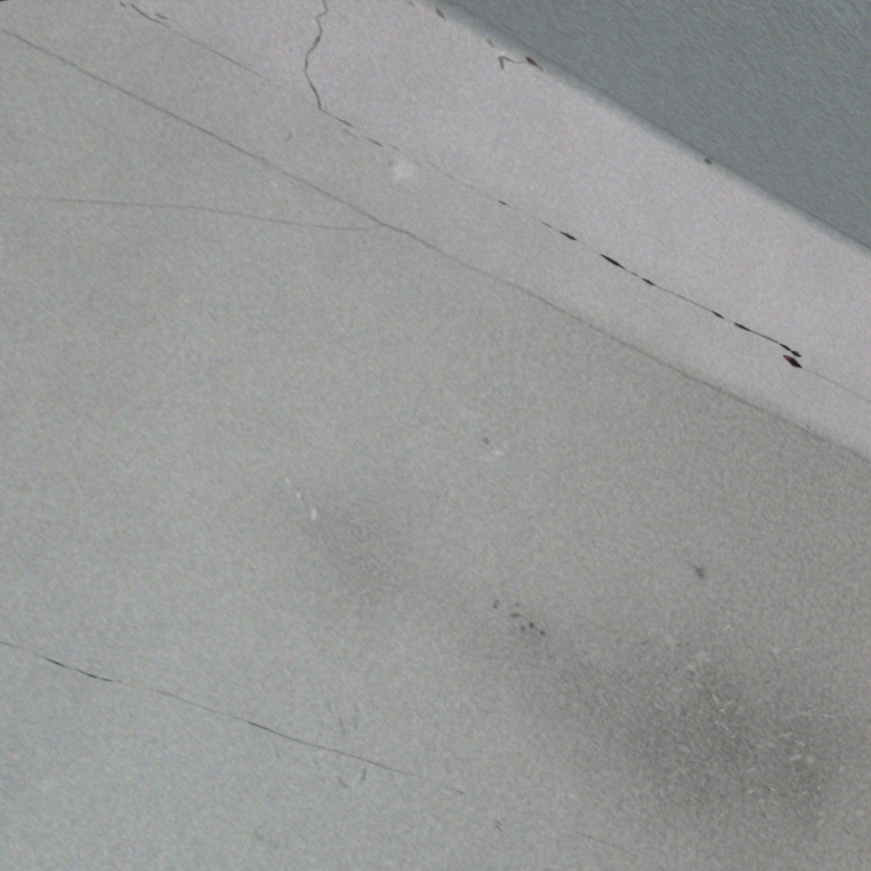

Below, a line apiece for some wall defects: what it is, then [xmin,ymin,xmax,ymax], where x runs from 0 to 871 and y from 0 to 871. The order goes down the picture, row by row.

crack [601,254,625,269]
crack [713,312,750,331]
crack [769,338,802,368]